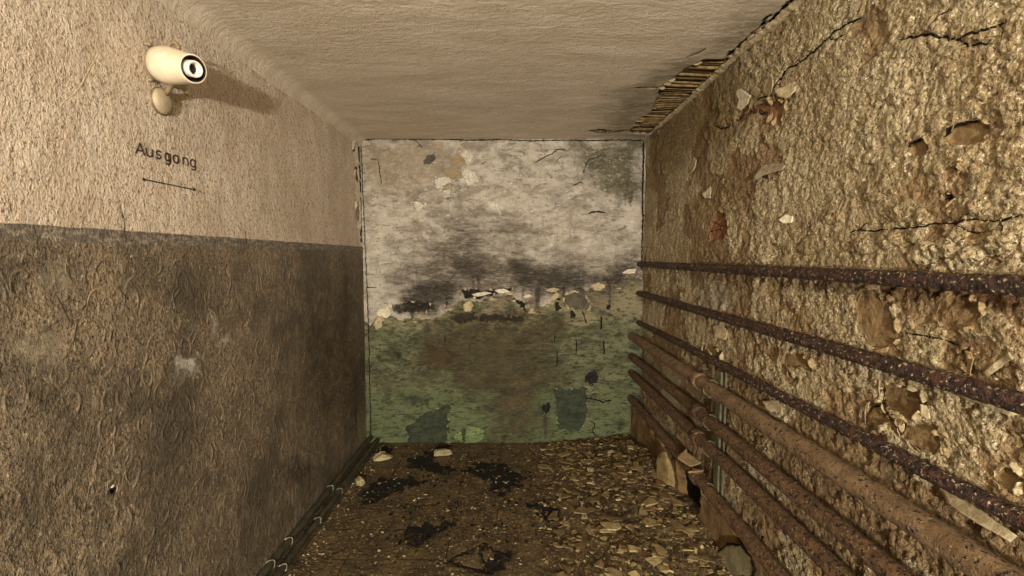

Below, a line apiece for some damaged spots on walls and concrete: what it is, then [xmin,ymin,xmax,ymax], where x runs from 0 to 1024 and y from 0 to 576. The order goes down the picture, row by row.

peeling [633,0,806,129]
spalling [733,65,796,143]
crack [714,14,862,130]
spalling [906,119,990,158]
crack [900,11,1007,47]
crack [848,214,1019,235]
water stain [386,223,640,443]
spalling [855,284,903,357]
spalling [932,291,1013,377]
spalling [861,380,950,458]
peeling [938,487,1017,542]
spalling [992,461,1024,497]